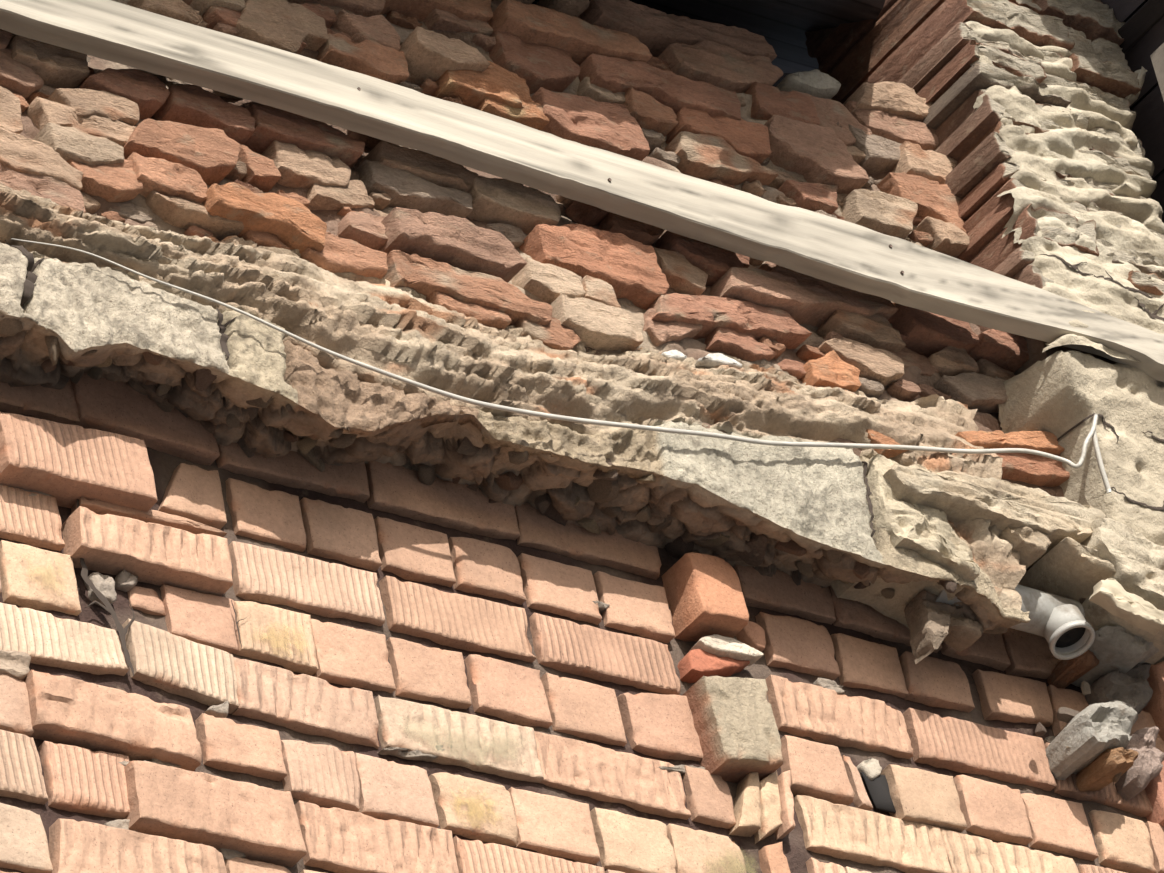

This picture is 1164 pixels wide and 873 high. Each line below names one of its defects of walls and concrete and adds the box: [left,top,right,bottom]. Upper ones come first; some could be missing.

crack [1040,254,1164,321]
crack [1057,413,1164,442]
spalling [0,310,1164,664]
crack [1091,487,1164,510]
spalling [0,649,31,679]
spalling [677,621,766,683]
spalling [857,758,896,814]